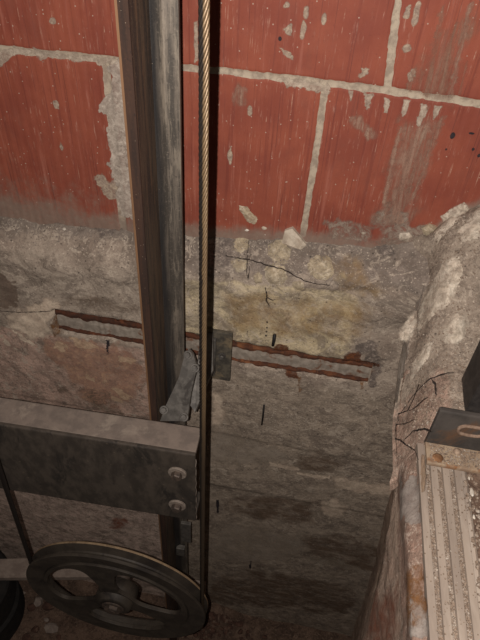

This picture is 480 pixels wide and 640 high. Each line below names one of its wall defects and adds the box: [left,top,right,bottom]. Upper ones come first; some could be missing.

peeling [95,58,133,220]
water stain [372,104,443,225]
spalling [0,216,150,420]
spalling [183,234,199,335]
crack [225,241,329,286]
rust [342,352,379,366]
spalling [186,237,430,637]
crack [395,372,453,460]
spalling [0,488,162,562]